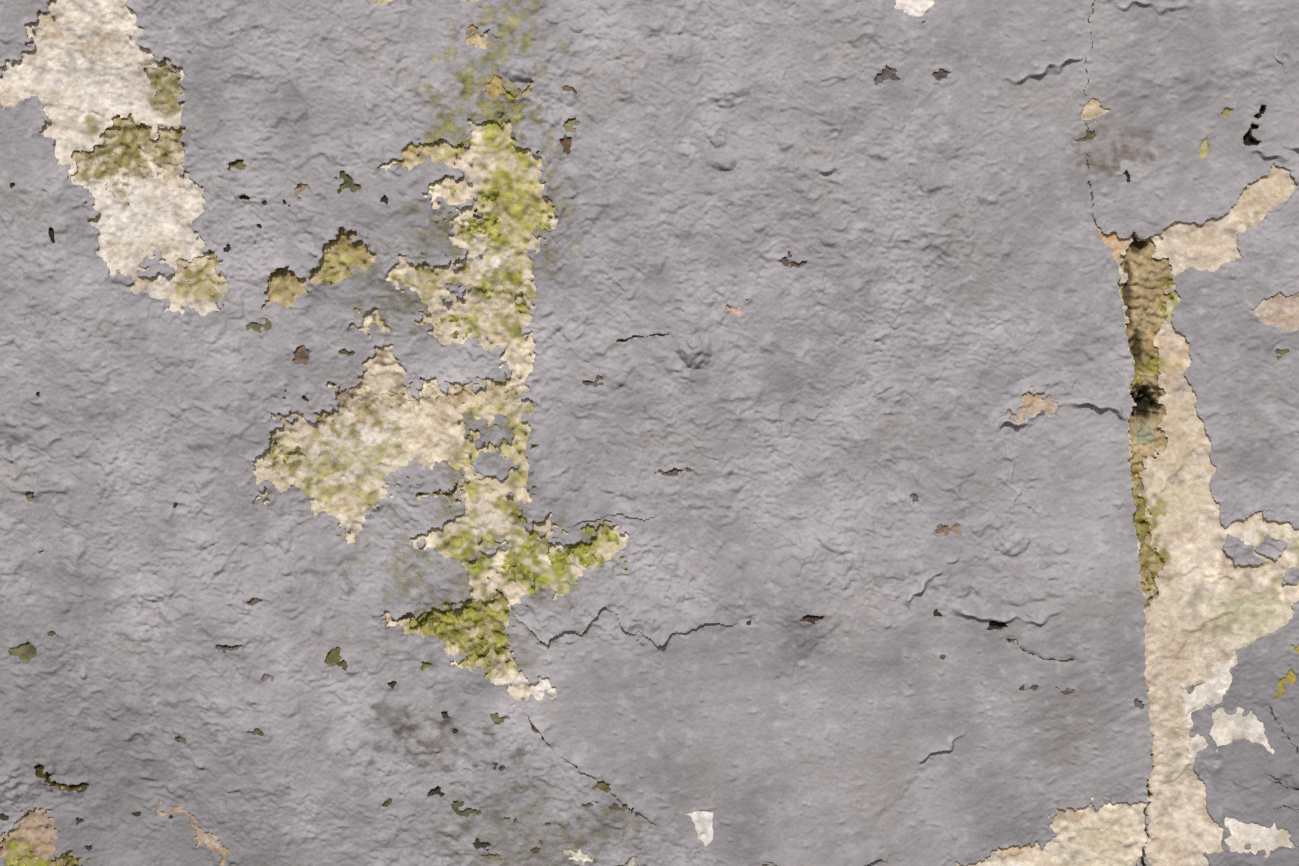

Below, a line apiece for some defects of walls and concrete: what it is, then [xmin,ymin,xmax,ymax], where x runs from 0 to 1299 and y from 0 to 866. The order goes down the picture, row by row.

peeling [894,0,934,24]
peeling [465,24,497,49]
peeling [0,0,231,316]
spalling [228,160,247,171]
peeling [246,75,754,846]
flaking render [955,163,1299,866]
spalling [934,524,962,537]
spalling [800,615,824,624]
crack [1141,765,1153,866]
peeling [0,807,92,866]
peeling [760,838,898,866]